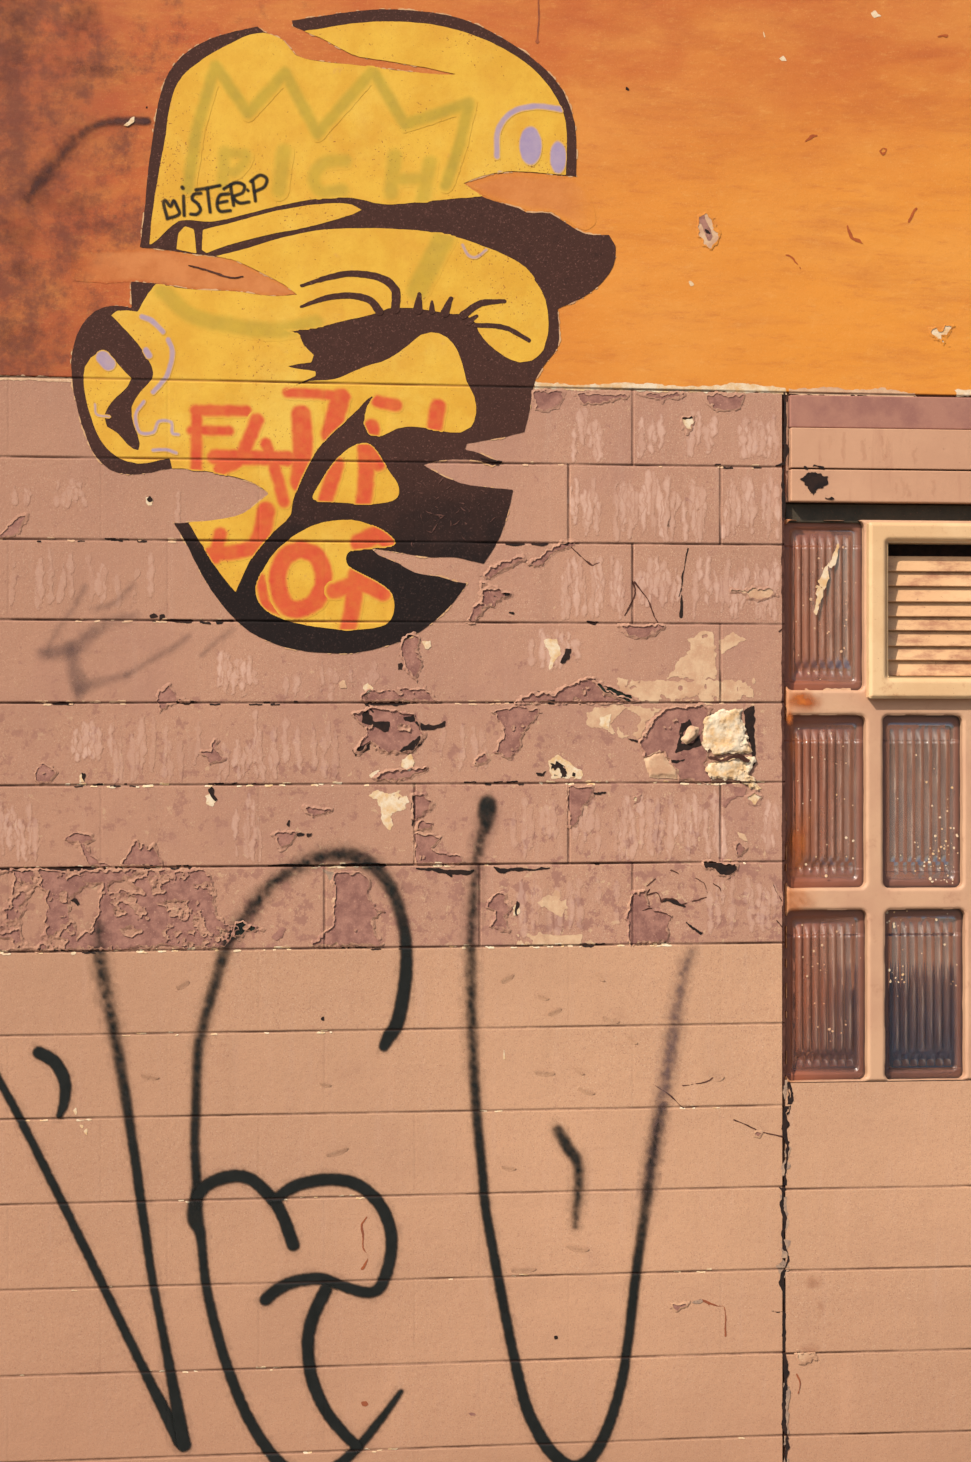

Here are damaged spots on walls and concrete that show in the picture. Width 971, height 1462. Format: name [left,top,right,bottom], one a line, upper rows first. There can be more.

peeling [800,464,834,500]
peeling [155,682,190,713]
peeling [339,631,641,867]
spalling [629,700,765,807]
spalling [205,784,217,807]
peeling [270,781,342,852]
peeling [701,832,749,880]
peeling [0,830,291,955]
peeling [311,862,385,949]
peeling [449,891,595,949]
peeling [617,889,703,947]
crack [715,392,801,1462]